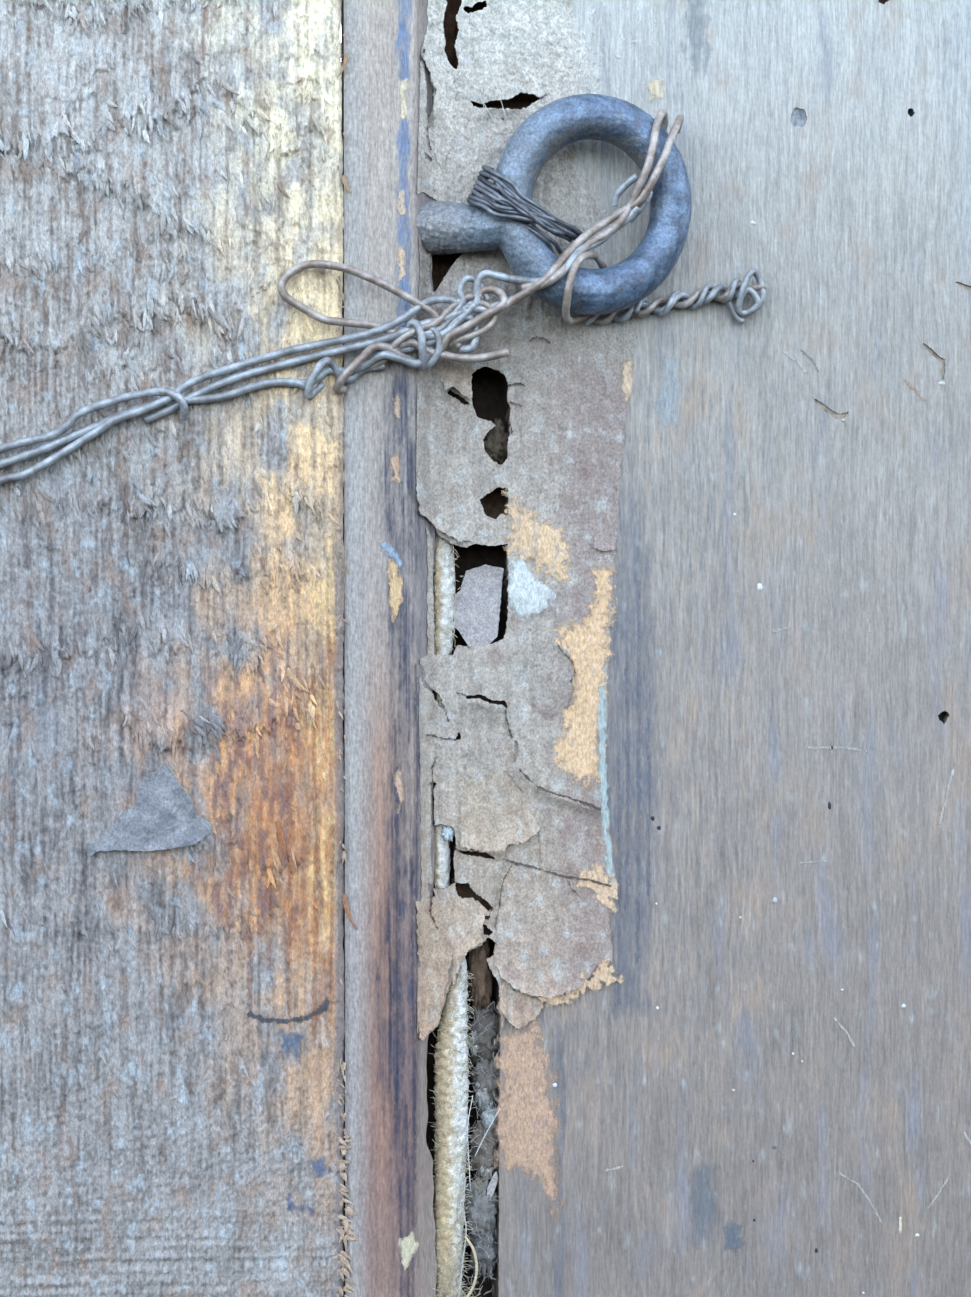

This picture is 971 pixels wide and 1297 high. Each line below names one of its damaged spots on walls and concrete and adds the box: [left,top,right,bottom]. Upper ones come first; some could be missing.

peeling [398,0,664,215]
peeling [533,139,647,269]
peeling [390,235,638,1214]